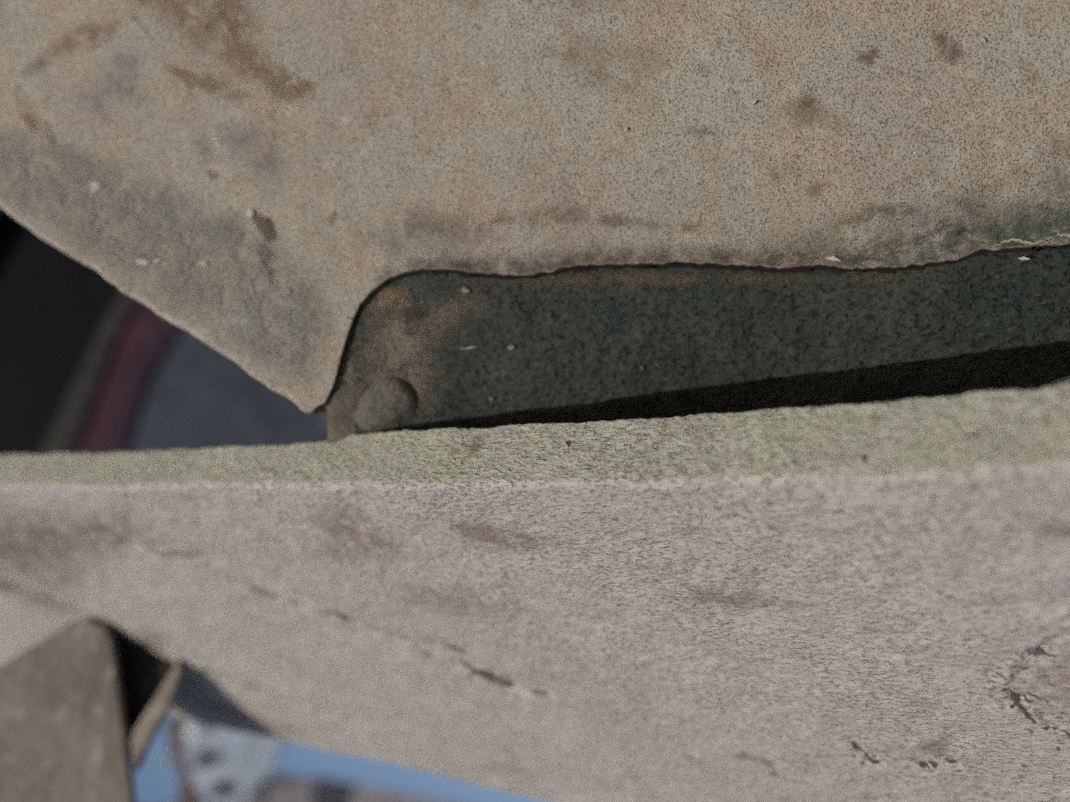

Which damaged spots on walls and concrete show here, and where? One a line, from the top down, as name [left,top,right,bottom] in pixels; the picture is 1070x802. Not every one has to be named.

crack [990,646,1070,751]
crack [852,738,880,766]
crack [919,755,957,773]